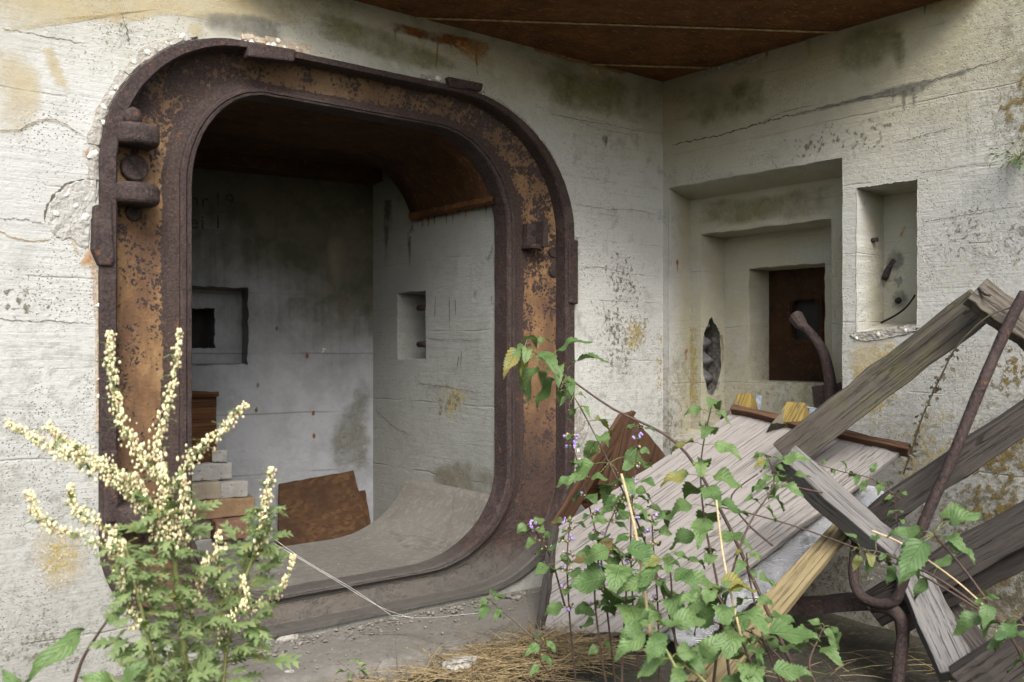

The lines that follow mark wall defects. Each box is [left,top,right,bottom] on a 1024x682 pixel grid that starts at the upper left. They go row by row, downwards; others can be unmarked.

crack [1,28,80,43]
corrosion [394,25,488,65]
crack [552,54,1018,145]
crack [1,118,84,136]
spalling [44,33,198,250]
crack [0,217,50,242]
crack [1,316,93,324]
spalling [704,317,721,395]